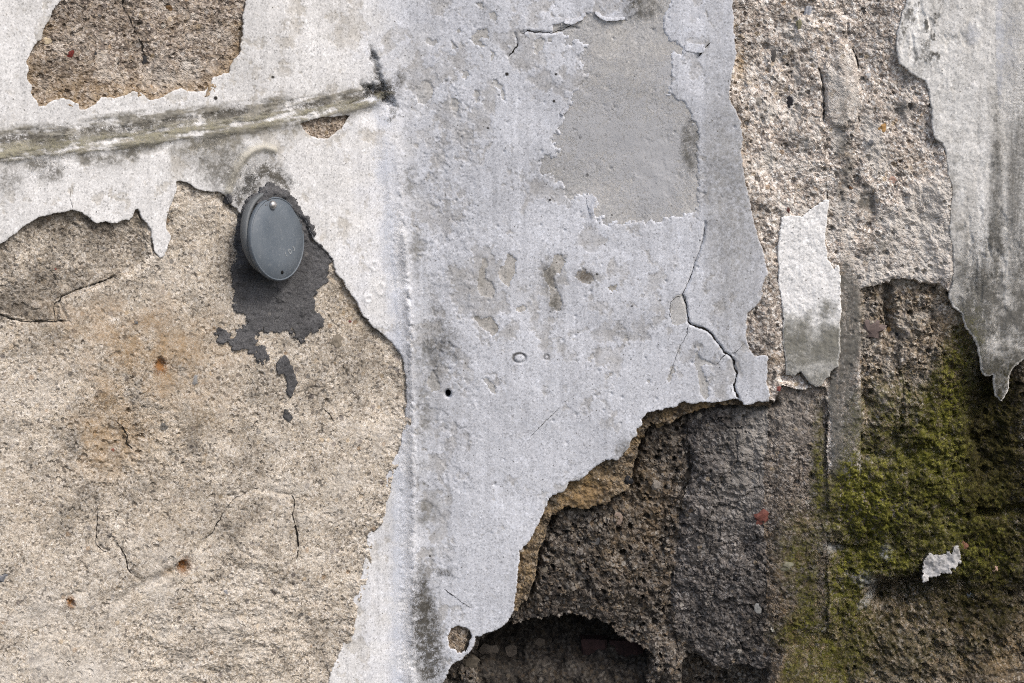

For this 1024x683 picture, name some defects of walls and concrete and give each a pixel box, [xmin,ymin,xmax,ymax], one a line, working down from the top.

spalling [26,0,245,113]
spalling [300,115,348,139]
crack [0,276,114,322]
crack [96,507,132,574]
spalling [0,181,411,683]
crack [291,495,299,561]
crack [668,228,742,398]
spalling [443,0,1024,683]
damp [783,263,863,479]
damp [856,409,985,580]